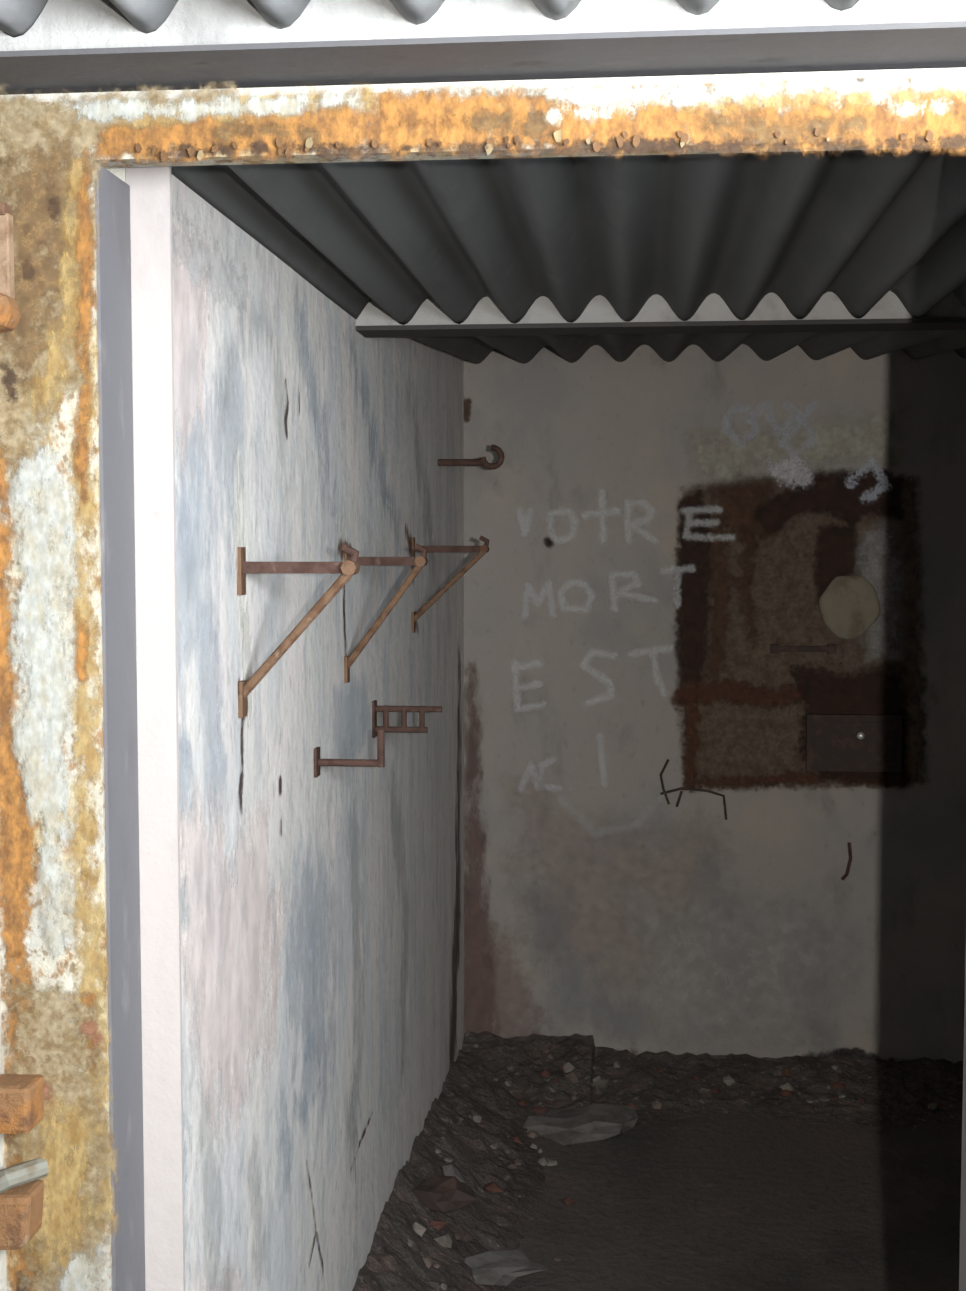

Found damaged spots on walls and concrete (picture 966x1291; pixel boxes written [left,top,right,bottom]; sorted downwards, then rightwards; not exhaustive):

corrosion [0,82,966,535]
corrosion [0,445,117,1291]
corrosion [238,679,248,810]